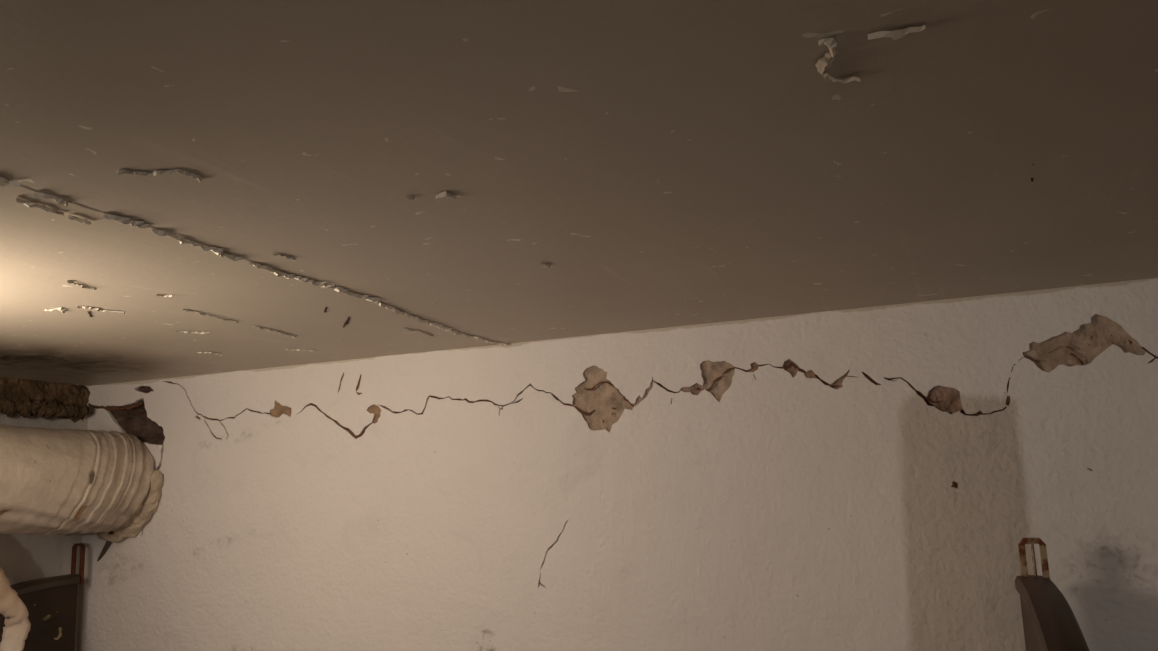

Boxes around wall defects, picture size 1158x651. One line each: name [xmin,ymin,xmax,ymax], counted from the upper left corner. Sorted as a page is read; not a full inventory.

peeling [868,25,926,40]
peeling [815,38,860,84]
leakage [0,351,121,372]
crack [197,409,271,439]
crack [308,384,573,439]
flaking render [572,366,653,432]
crack [629,380,702,407]
flaking render [681,360,736,402]
crack [736,364,933,406]
crack [960,357,1023,416]
flaking render [1022,314,1147,372]
crack [1128,340,1158,363]